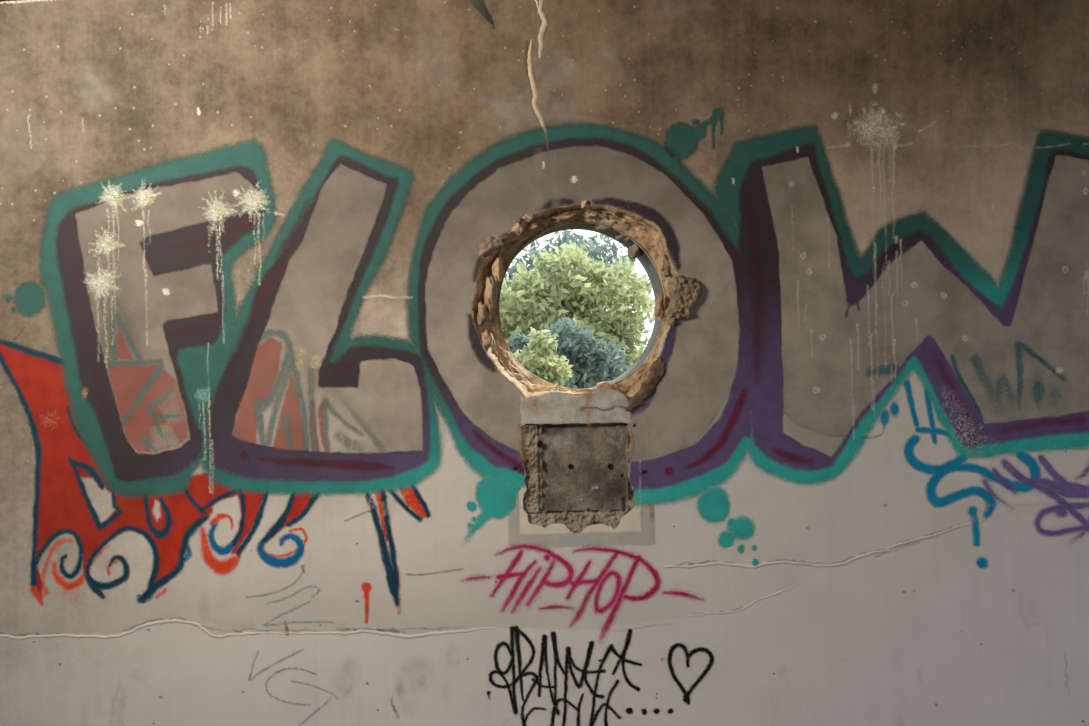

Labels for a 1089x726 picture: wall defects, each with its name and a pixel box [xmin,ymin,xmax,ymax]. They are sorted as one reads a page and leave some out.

crack [526,0,548,131]
spalling [472,200,702,534]